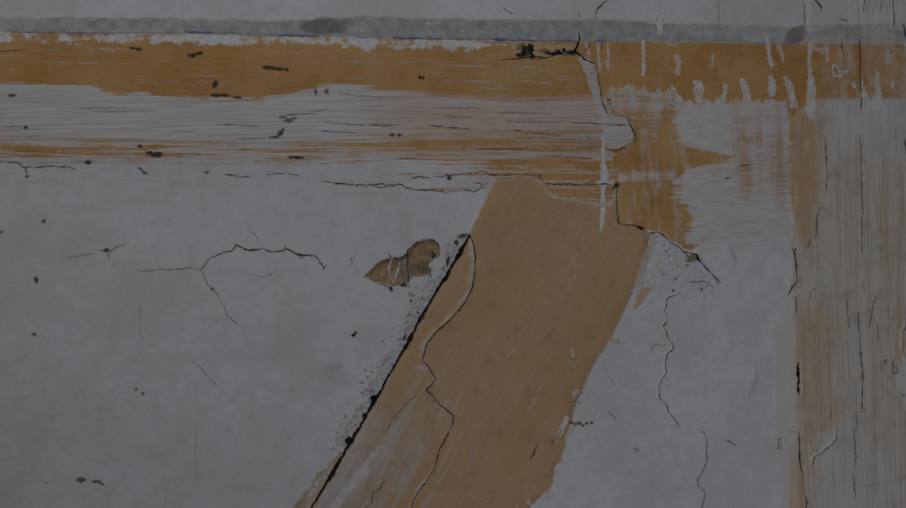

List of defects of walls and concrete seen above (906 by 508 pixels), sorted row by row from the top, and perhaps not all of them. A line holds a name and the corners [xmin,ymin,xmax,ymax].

crack [140,245,327,323]
spalling [292,232,472,508]
crack [311,234,476,508]
peeling [0,13,895,307]
crack [335,130,721,283]
crack [651,293,681,427]
crack [697,431,734,508]
crack [796,355,804,409]
crack [788,138,828,311]
crack [798,352,863,508]
crack [857,143,865,251]
crack [847,282,906,372]